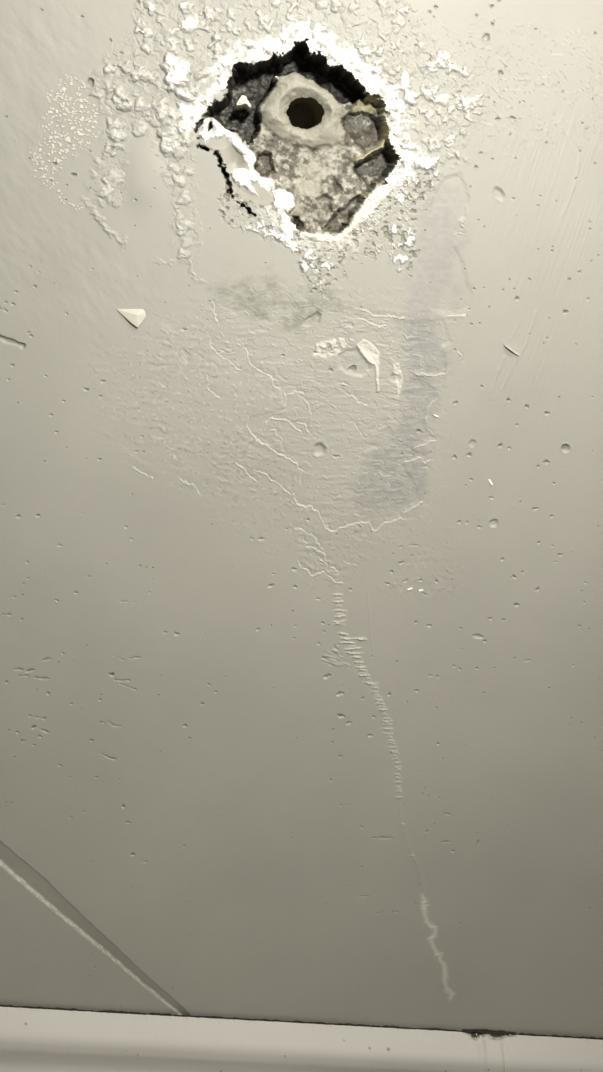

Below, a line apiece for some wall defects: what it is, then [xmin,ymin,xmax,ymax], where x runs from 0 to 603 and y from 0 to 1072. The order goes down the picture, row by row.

spalling [194,38,402,254]
crack [327,566,458,1004]